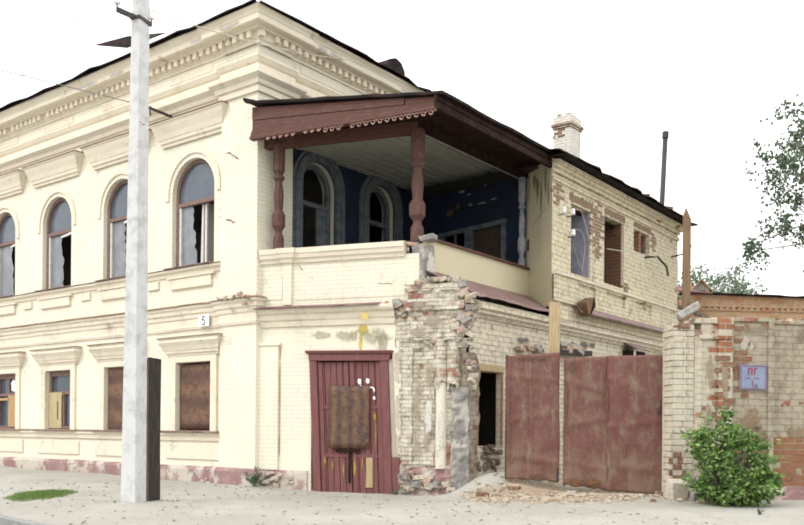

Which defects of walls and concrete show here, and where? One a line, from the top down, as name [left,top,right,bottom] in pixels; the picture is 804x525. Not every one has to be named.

corrosion [180,363,210,429]
corrosion [328,386,370,448]
spalling [379,251,480,495]
flaking render [701,326,754,421]
spalling [476,486,521,498]
flaking render [734,437,804,487]